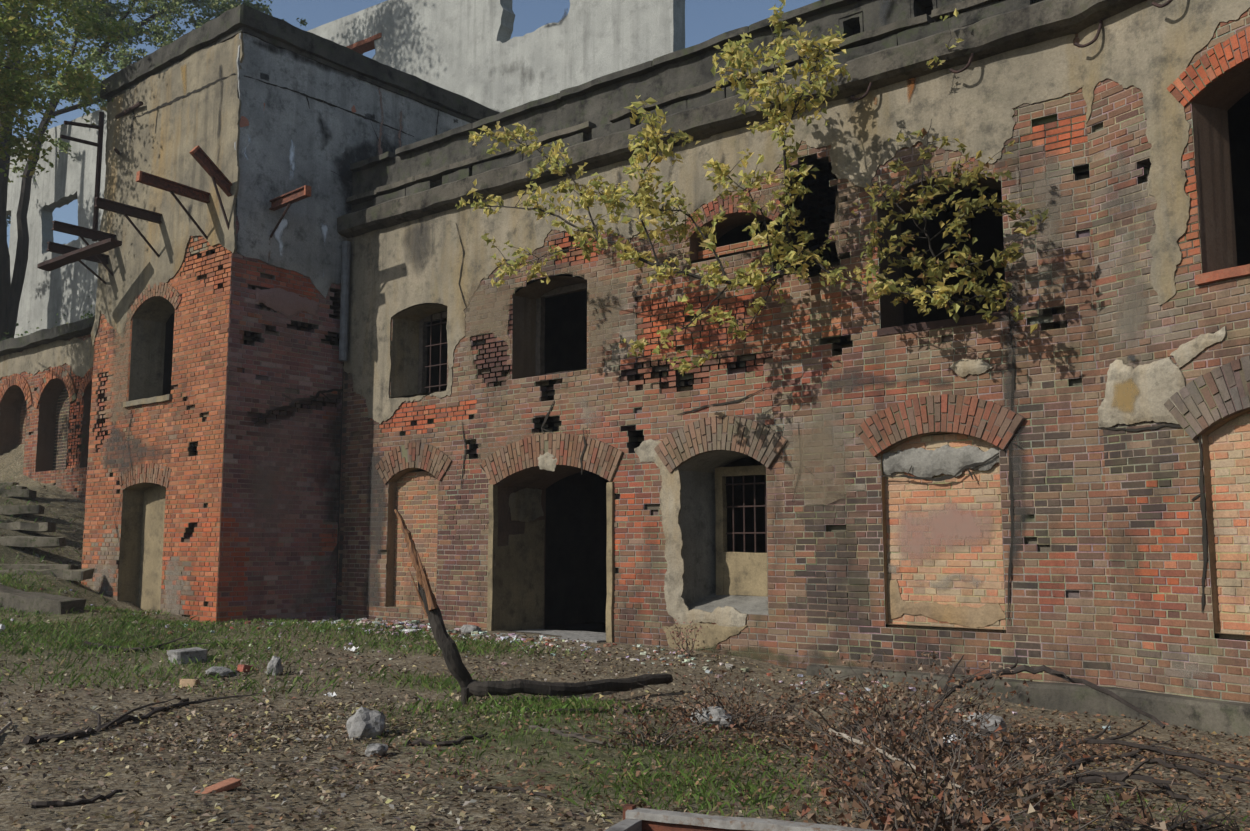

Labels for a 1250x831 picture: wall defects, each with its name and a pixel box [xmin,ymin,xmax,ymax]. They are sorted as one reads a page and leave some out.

crack [134,73,439,141]
leakage [335,139,397,213]
spalling [1020,114,1090,181]
spalling [1137,158,1151,184]
spalling [1176,159,1202,276]
spalling [180,236,341,346]
spalling [470,304,513,388]
spalling [619,291,773,394]
spalling [820,334,853,356]
spalling [67,368,113,472]
spalling [370,399,477,436]
flaking render [138,485,166,613]